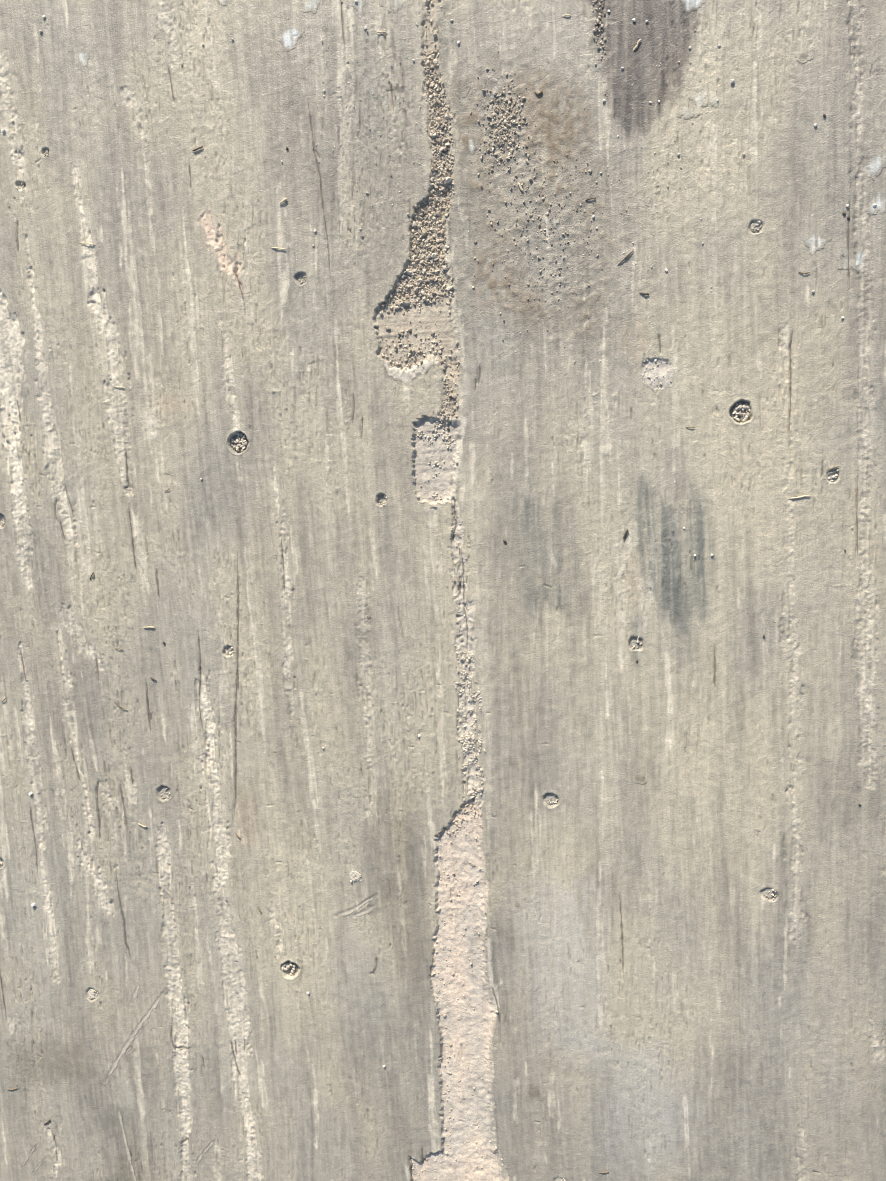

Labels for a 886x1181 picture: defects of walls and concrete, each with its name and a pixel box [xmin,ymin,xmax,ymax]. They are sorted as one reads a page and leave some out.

water stain [286,5,431,307]
water stain [438,0,708,360]
peeling [372,0,510,1181]